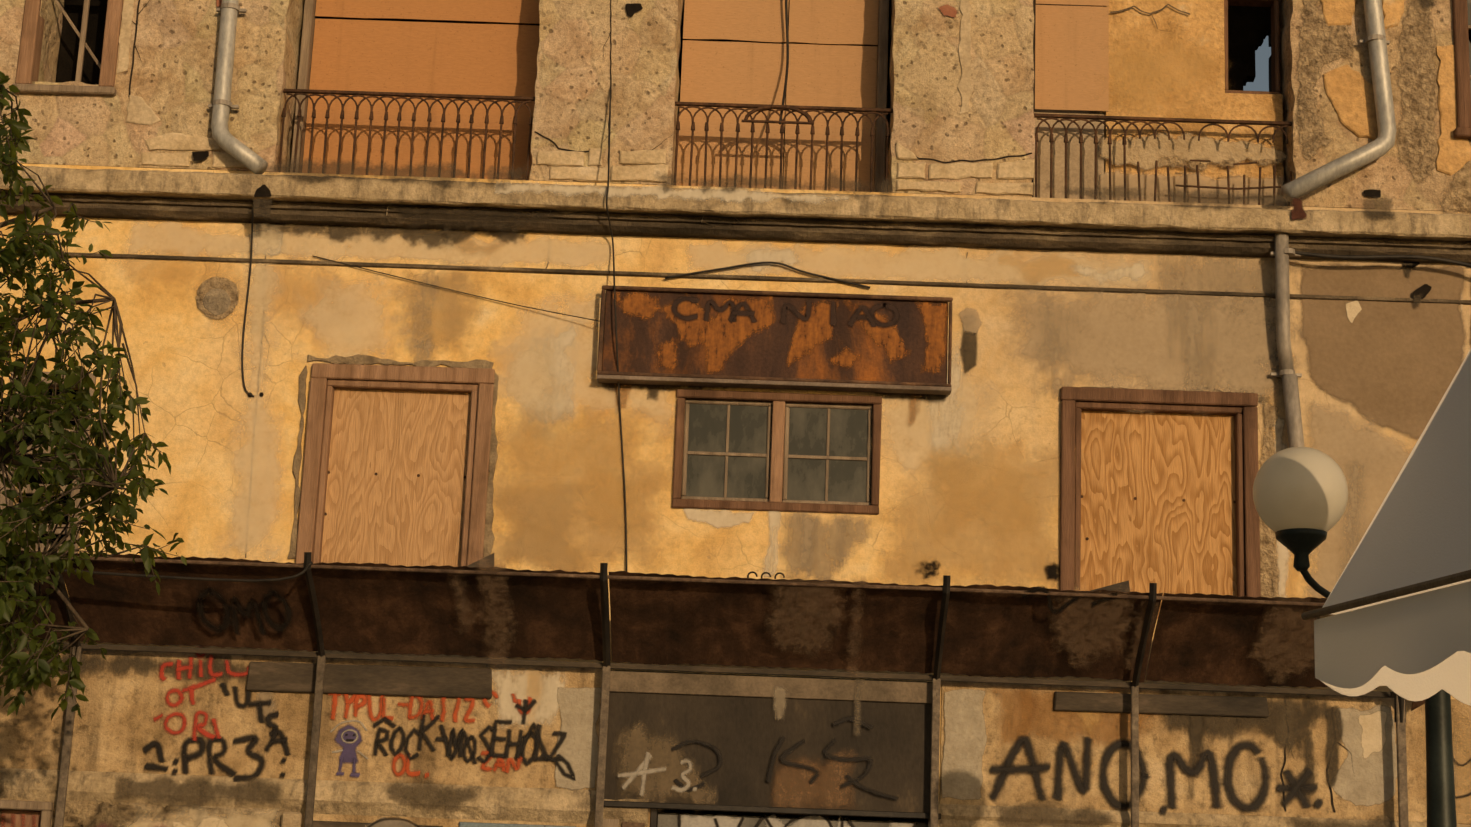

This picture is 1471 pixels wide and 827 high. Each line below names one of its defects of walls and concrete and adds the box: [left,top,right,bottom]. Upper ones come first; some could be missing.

spalling [1097,0,1378,206]
spalling [1382,0,1471,214]
spalling [1363,189,1381,198]
spalling [1346,301,1361,323]
spalling [1403,262,1432,307]
leakage [130,199,609,549]
leakage [514,303,669,421]
leakage [684,508,866,580]
rust [454,562,511,658]
rust [770,580,865,653]
rust [1056,594,1148,664]
rust [1254,606,1321,678]